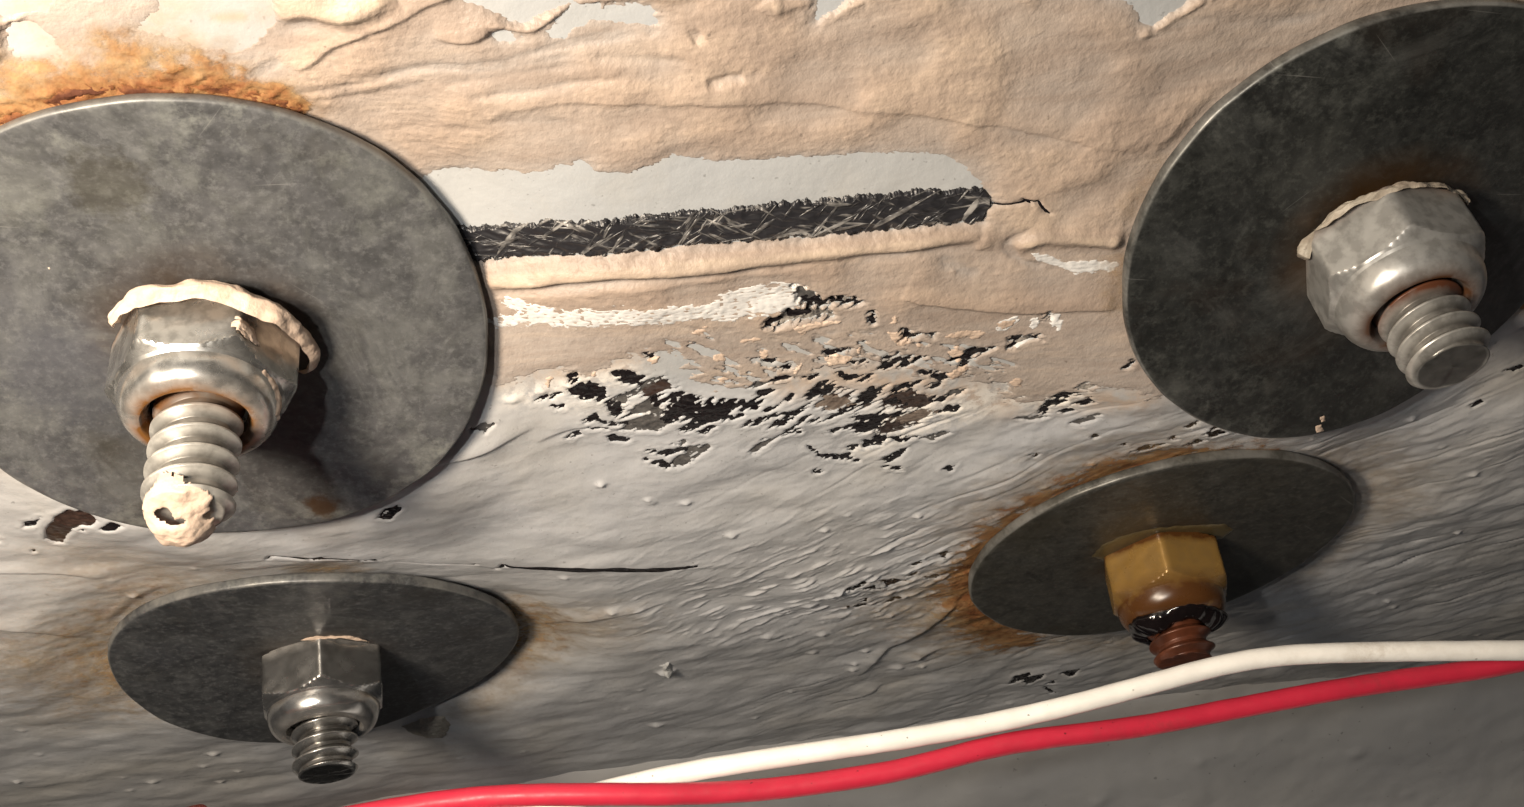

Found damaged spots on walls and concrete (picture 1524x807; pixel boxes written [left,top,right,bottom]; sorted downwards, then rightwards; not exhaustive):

rust [0,31,311,125]
peeling [1031,253,1119,275]
peeling [487,282,1064,473]
peeling [1016,381,1101,438]
peeling [1120,420,1226,452]
peeling [25,509,121,551]
crack [267,554,378,562]
crack [497,564,698,572]
peeling [845,551,949,608]
rust [923,440,1279,654]
peeling [1008,669,1080,693]